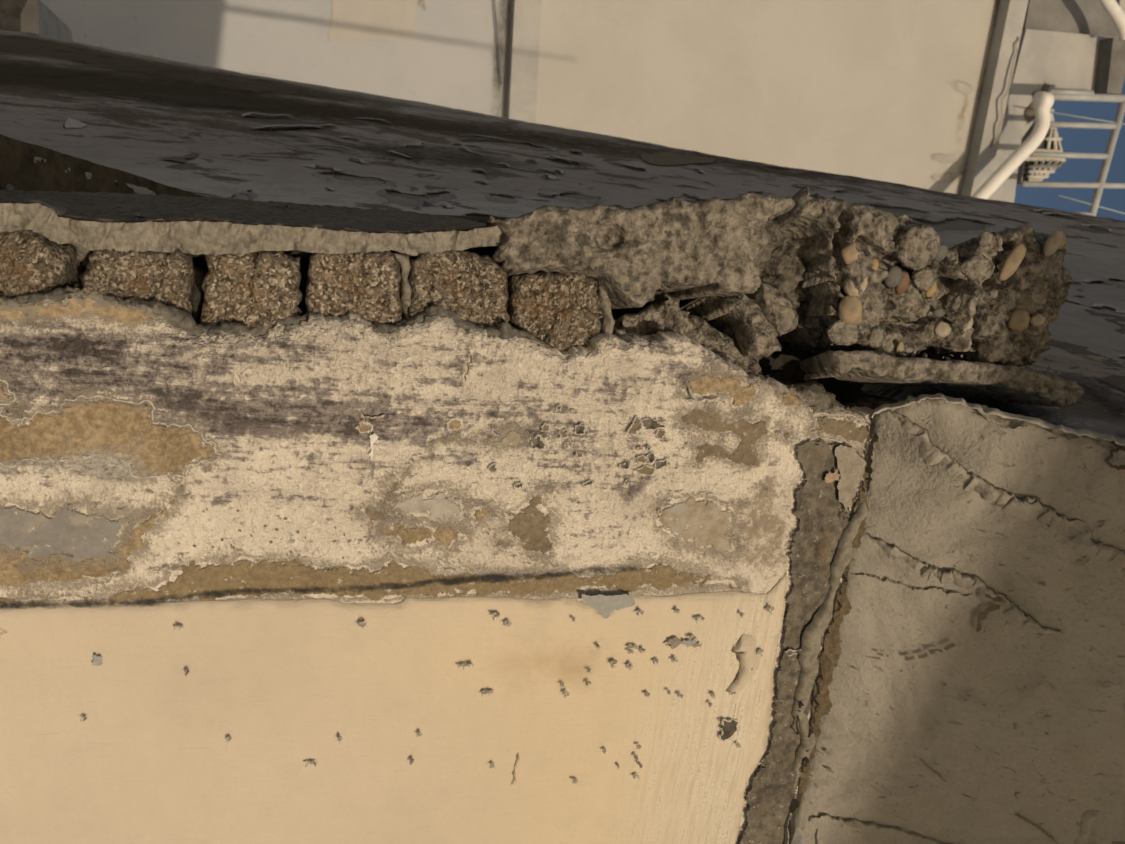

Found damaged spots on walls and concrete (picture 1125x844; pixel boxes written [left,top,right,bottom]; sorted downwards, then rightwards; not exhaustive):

peeling [242,112,338,130]
peeling [450,134,579,203]
peeling [607,152,717,174]
water stain [158,395,331,442]
water stain [0,439,152,483]
spalling [0,171,1125,844]
water stain [625,477,649,502]
crack [785,409,1086,844]